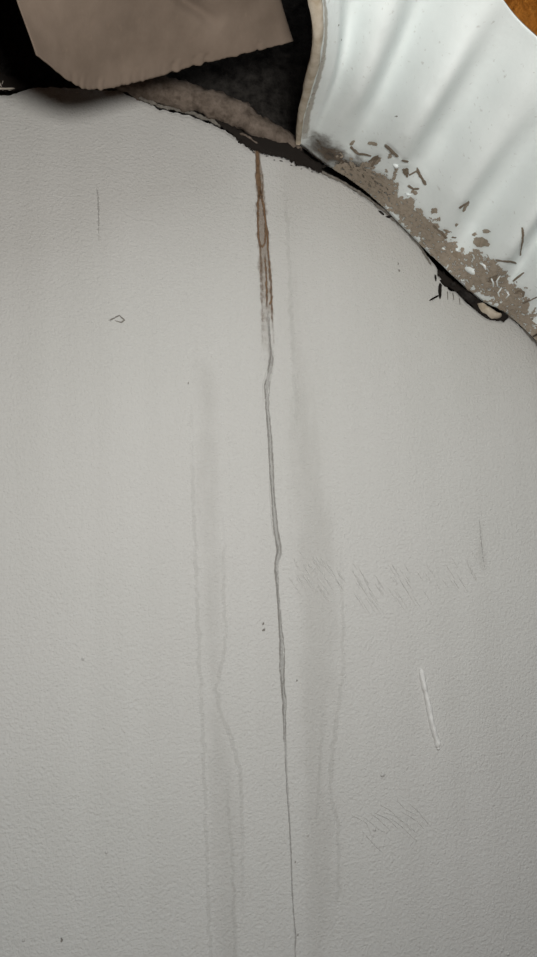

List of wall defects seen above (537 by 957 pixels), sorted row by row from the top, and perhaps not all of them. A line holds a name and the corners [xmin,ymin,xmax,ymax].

peeling [215,119,537,341]
crack [262,334,286,709]